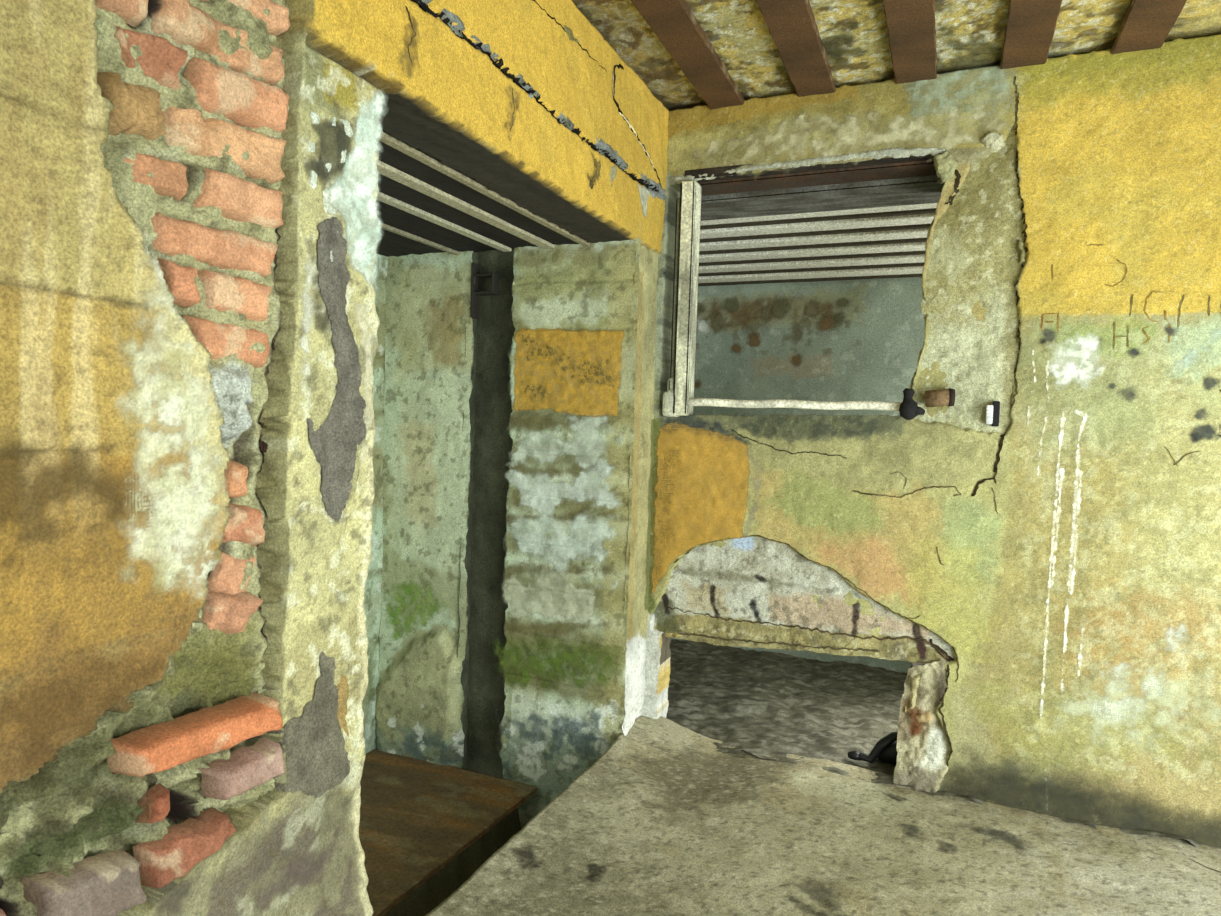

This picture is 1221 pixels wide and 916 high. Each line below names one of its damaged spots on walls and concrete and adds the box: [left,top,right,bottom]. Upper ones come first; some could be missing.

crack [411,0,666,201]
flaking render [0,0,350,916]
peeling [301,93,384,522]
crack [731,429,846,458]
spalling [651,422,955,793]
crack [853,76,1028,514]
damp [1027,350,1199,738]
spalling [1191,409,1221,442]
spalling [1204,378,1221,392]